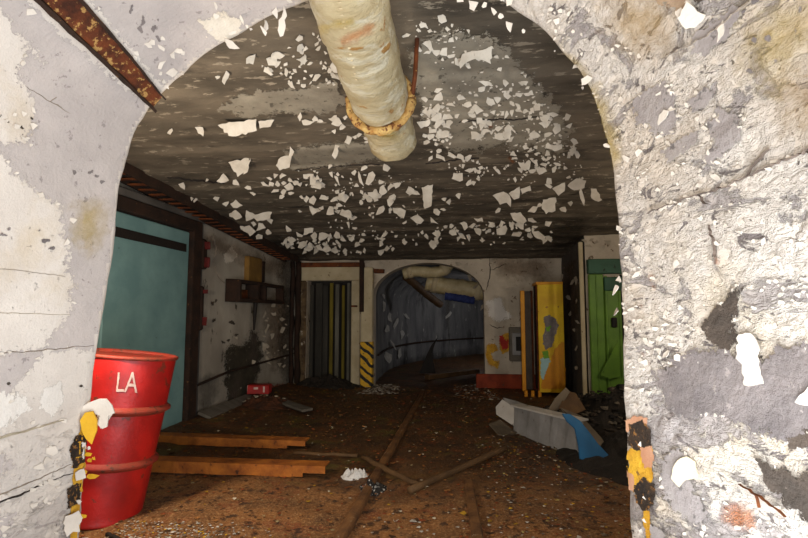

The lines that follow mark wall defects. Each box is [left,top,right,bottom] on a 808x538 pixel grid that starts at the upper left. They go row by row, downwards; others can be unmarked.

peeling [90,0,301,89]
peeling [457,0,513,32]
peeling [541,7,583,52]
peeling [213,14,602,268]
peeling [0,0,146,404]
peeling [205,158,256,196]
crack [646,149,808,214]
crack [708,225,717,264]
peeling [612,223,808,454]
crack [0,464,73,503]
peeling [53,500,87,537]
peeling [751,456,808,536]